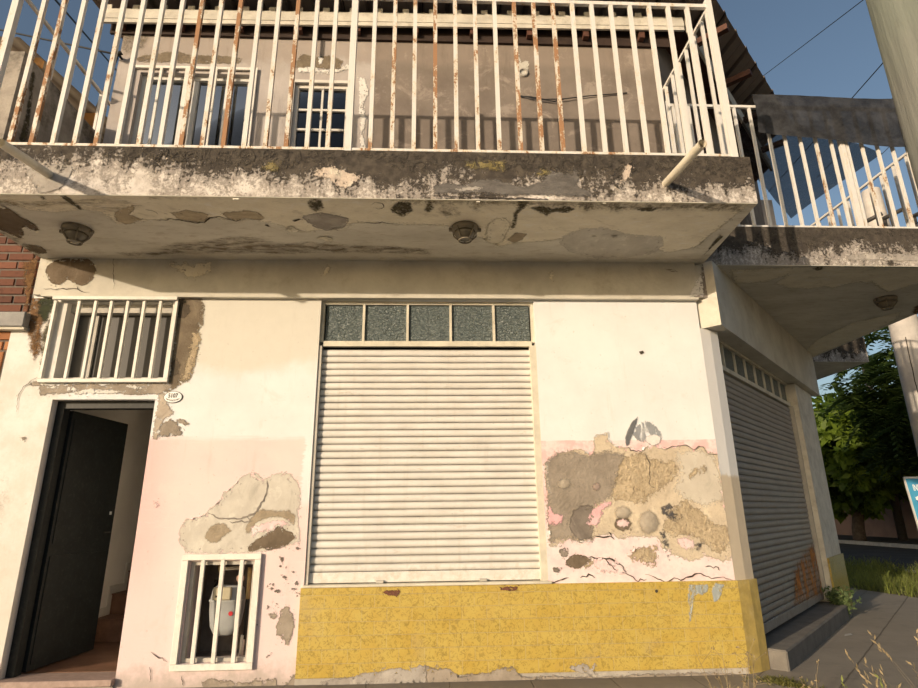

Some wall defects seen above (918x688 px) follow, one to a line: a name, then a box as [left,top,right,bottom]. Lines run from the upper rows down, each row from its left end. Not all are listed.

leakage [81,122,750,193]
leakage [308,199,324,211]
peeling [0,165,749,259]
leakage [391,200,451,217]
leakage [509,201,740,243]
flaking render [44,258,97,286]
peeling [729,266,918,292]
flaking render [30,299,206,440]
crack [209,482,268,523]
peeling [543,432,732,575]
peeling [178,472,301,596]
crack [552,532,731,583]